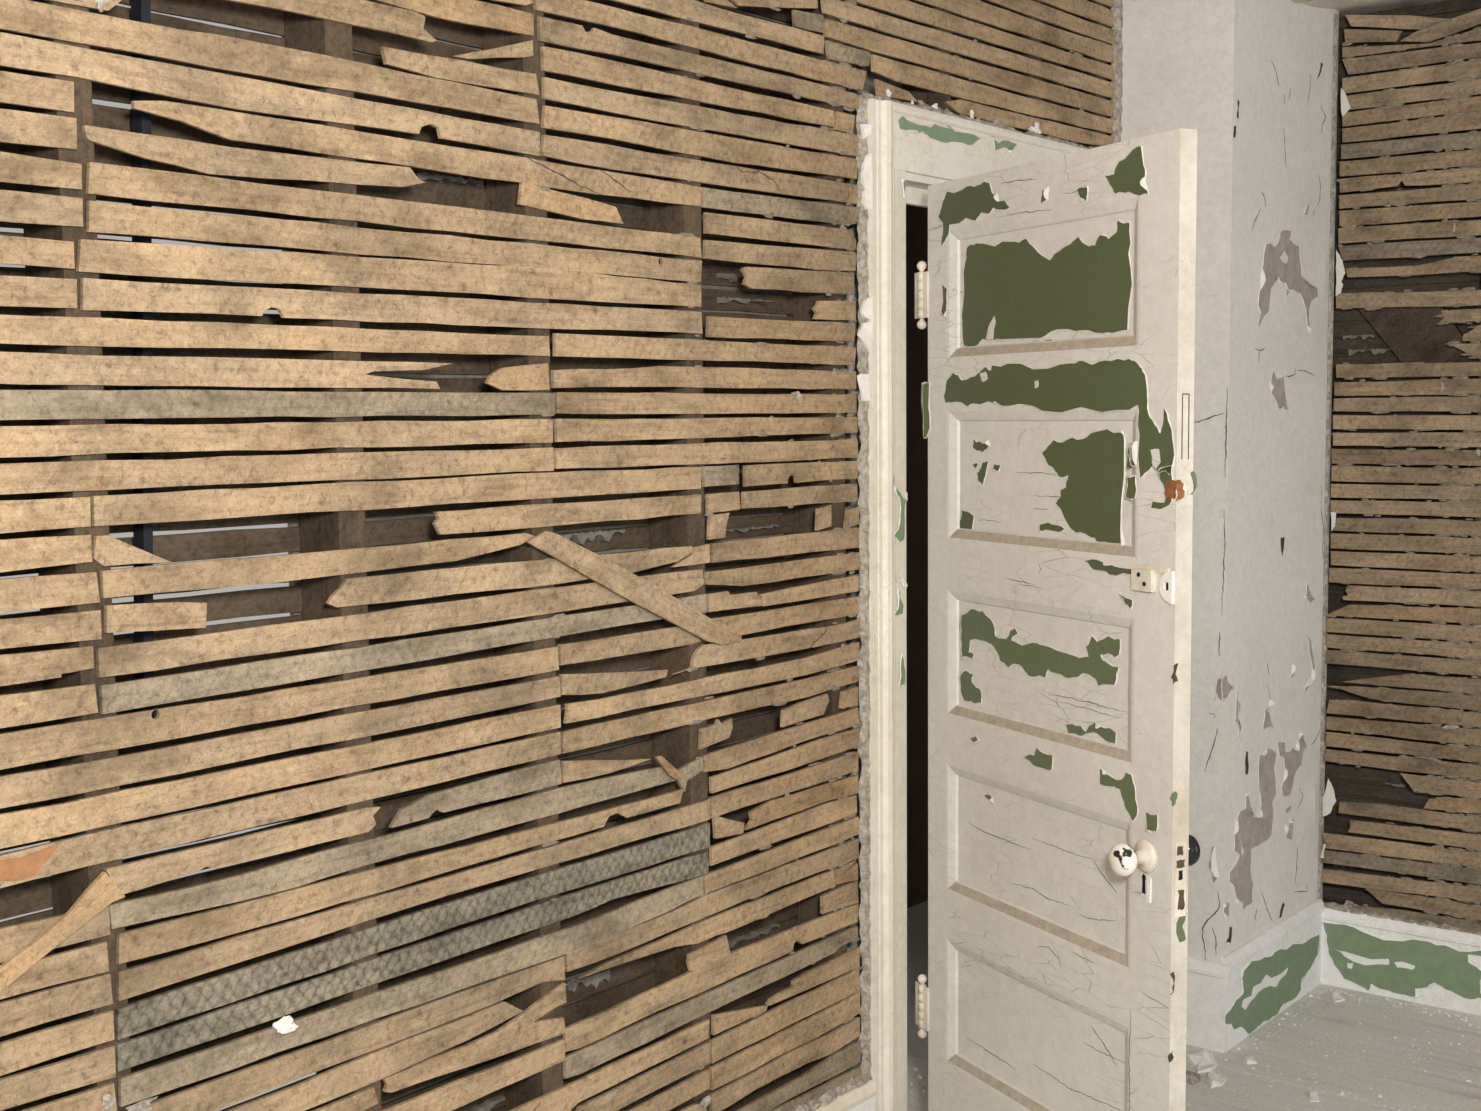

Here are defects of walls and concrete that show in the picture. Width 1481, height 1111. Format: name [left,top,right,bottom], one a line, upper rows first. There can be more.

peeling [897,115,1017,154]
peeling [938,180,1011,246]
peeling [1105,145,1149,197]
peeling [940,219,1134,347]
peeling [1257,229,1345,334]
peeling [921,358,1197,609]
peeling [959,608,1122,705]
peeling [1066,722,1117,745]
peeling [1099,767,1178,834]
peeling [1208,674,1306,943]
peeling [1322,778,1336,817]
peeling [1224,922,1481,1035]